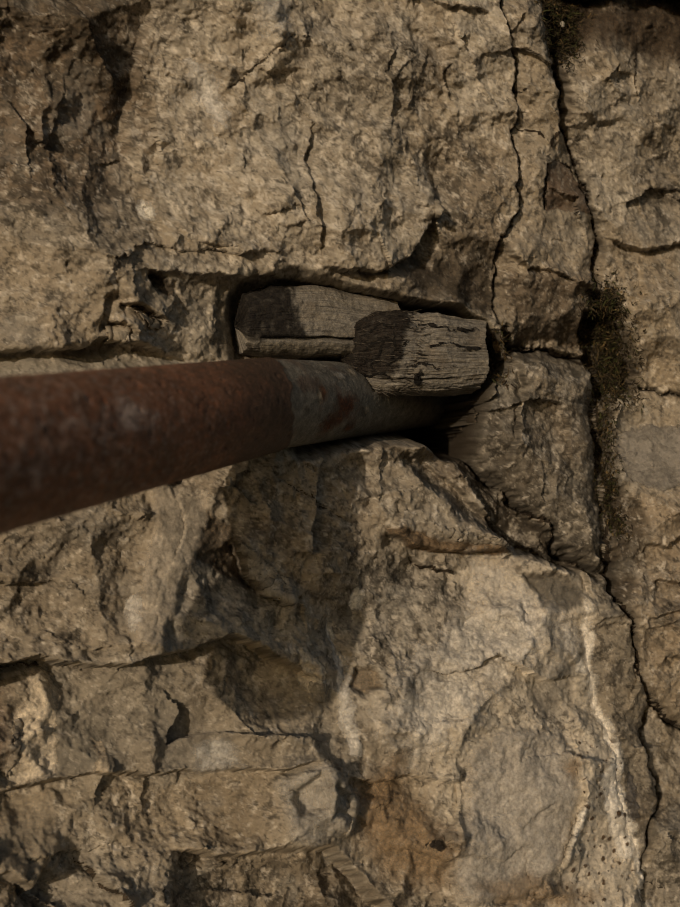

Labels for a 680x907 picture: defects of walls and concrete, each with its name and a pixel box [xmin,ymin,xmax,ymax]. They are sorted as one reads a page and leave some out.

damp [562,2,680,56]
crack [456,0,680,780]
crack [73,857,135,907]
crack [639,810,665,907]